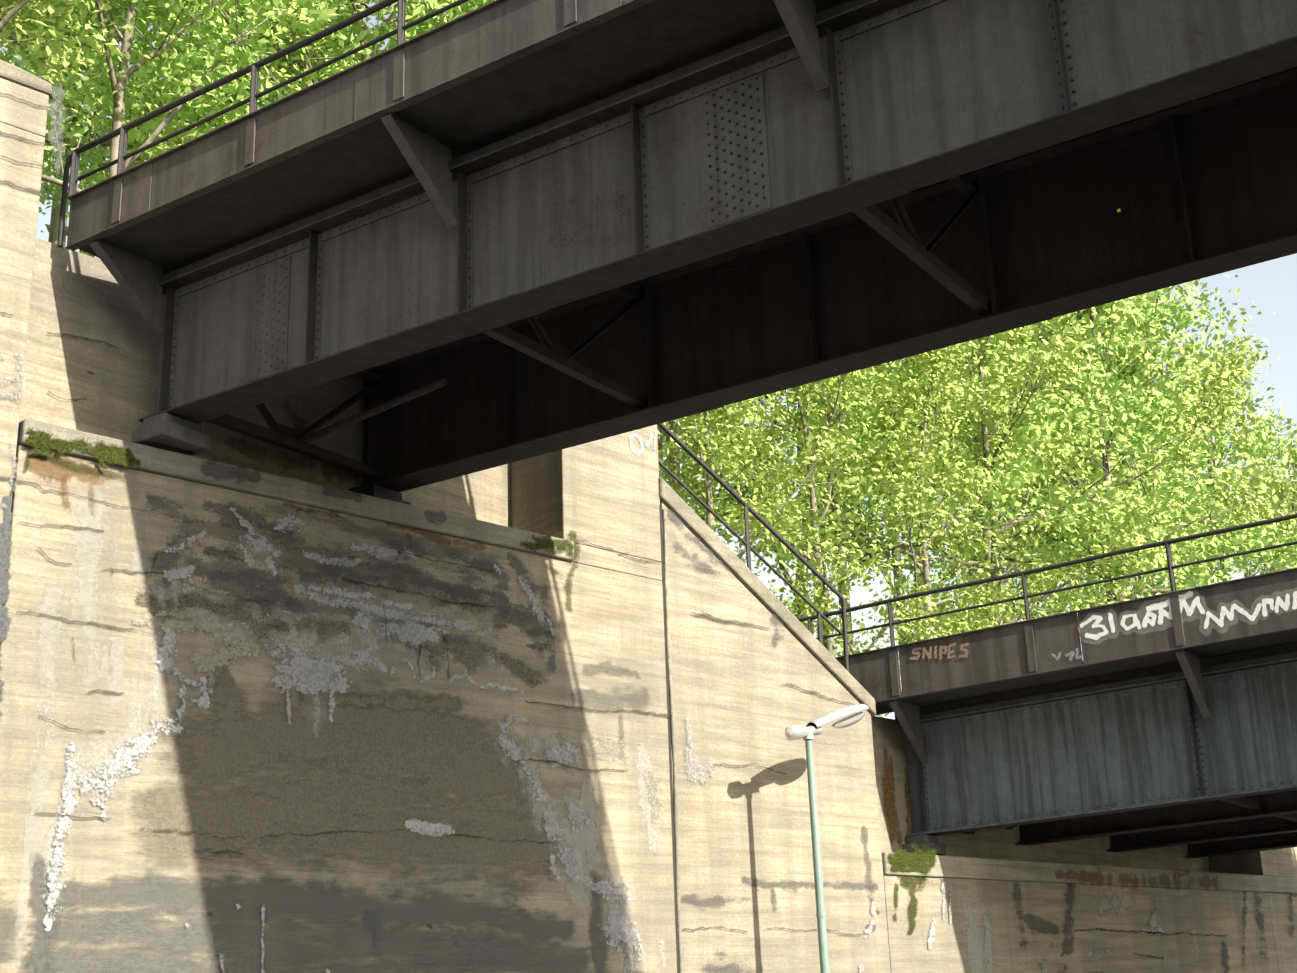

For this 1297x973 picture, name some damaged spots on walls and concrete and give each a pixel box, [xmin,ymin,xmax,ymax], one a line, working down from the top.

corrosion [28,452,103,506]
water stain [0,457,645,973]
crack [35,811,111,819]
crack [141,828,404,855]
crack [453,834,564,845]
water stain [636,744,659,852]
water stain [704,952,750,973]
water stain [682,826,878,938]
corrosion [882,750,912,847]
water stain [928,879,993,973]
water stain [1012,882,1076,973]
water stain [1221,891,1267,973]